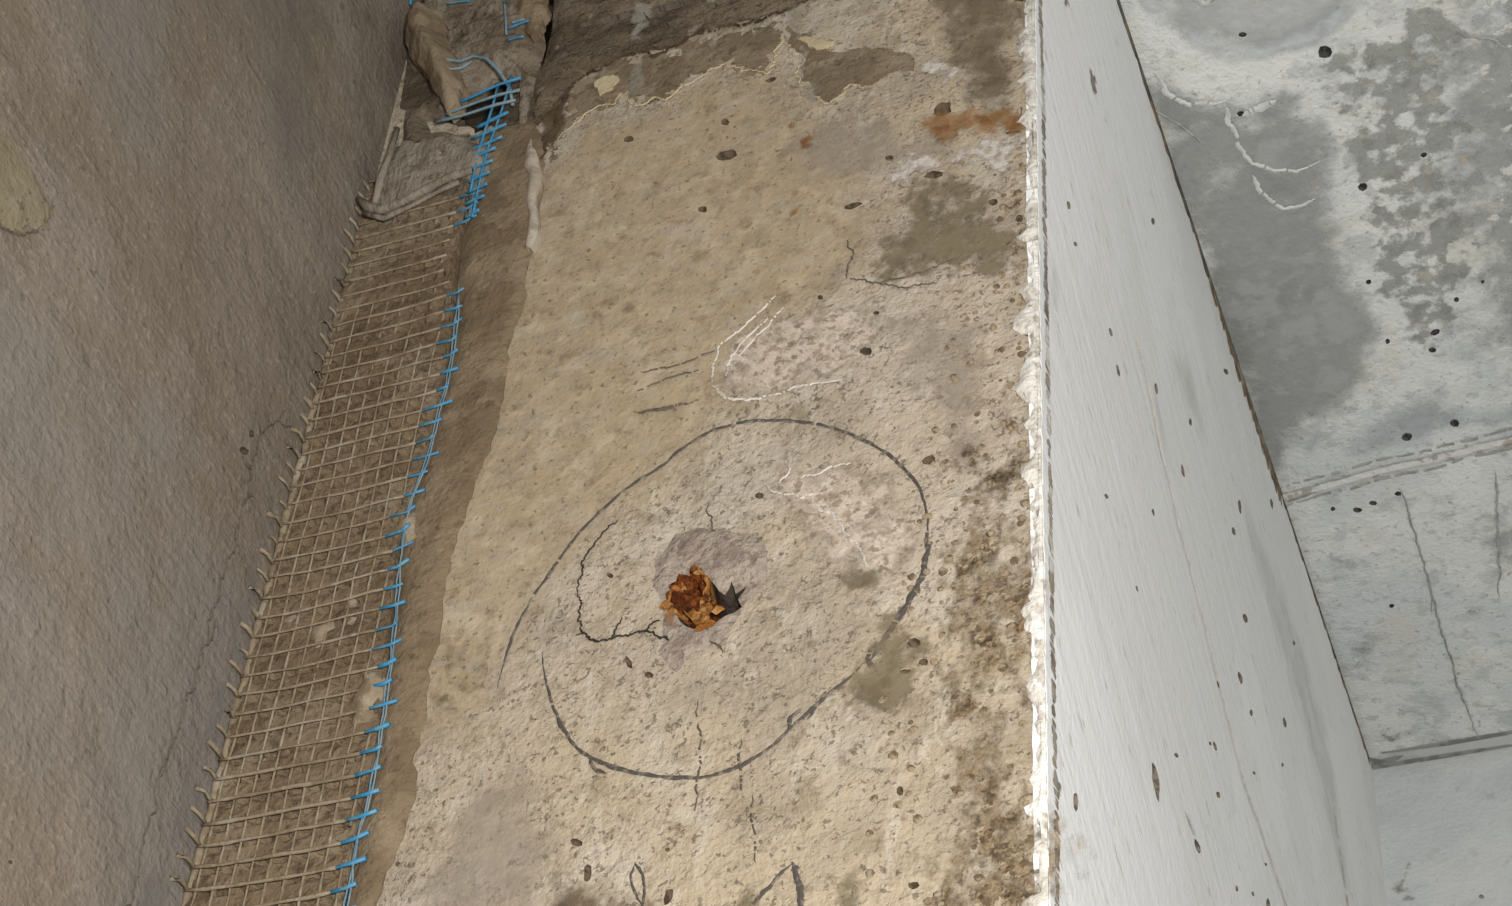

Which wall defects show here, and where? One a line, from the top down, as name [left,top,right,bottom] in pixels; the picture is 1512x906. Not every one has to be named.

peeling [355,0,915,254]
crack [536,0,809,159]
spalling [934,102,951,115]
corrosion [922,108,1024,140]
leakage [1151,0,1512,467]
crack [1039,0,1061,906]
crack [125,410,292,906]
crack [576,520,723,658]
corrosion [659,564,725,632]